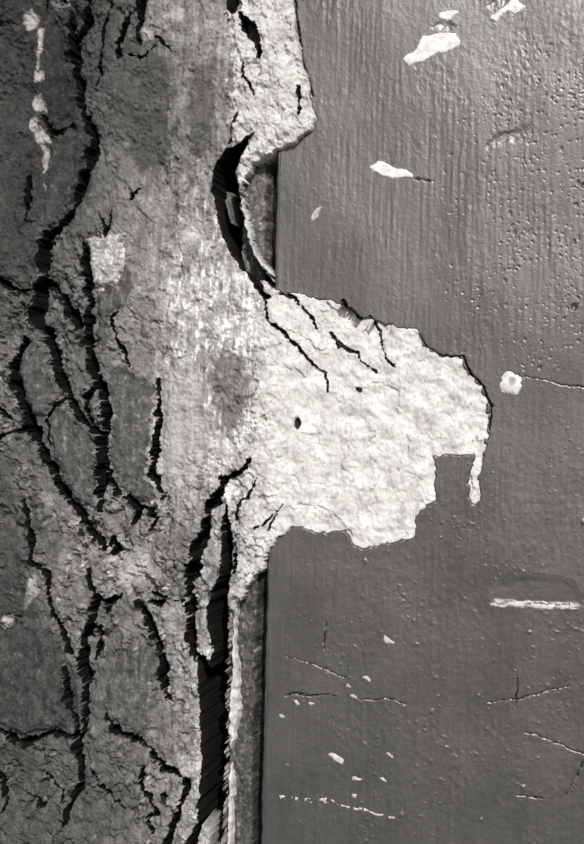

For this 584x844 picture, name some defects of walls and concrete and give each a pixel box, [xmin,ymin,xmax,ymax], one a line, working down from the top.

crack [226,0,263,95]
crack [293,0,301,44]
peeling [487,0,526,22]
crack [296,64,314,115]
crack [0,0,171,556]
crack [210,111,396,393]
flaking render [222,0,489,615]
crack [0,457,283,844]
crack [287,620,347,697]
crack [490,674,571,703]
crack [524,731,584,796]